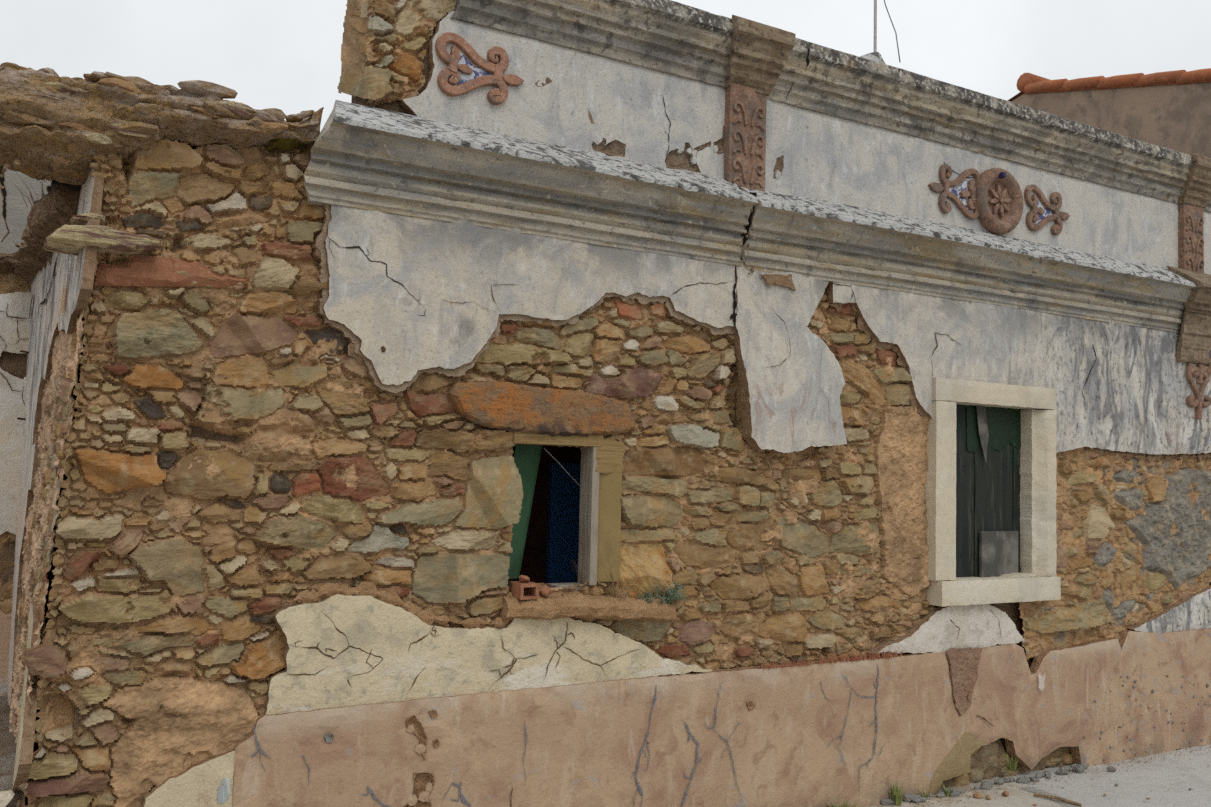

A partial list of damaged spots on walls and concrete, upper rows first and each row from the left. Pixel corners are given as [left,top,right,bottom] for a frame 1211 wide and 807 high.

spalling [665,126,724,173]
crack [0,165,9,242]
crack [673,192,757,332]
crack [0,253,70,405]
peeling [829,303,928,417]
spalling [1018,447,1211,660]
peeling [287,581,510,629]
crack [289,615,438,699]
crack [488,622,641,691]
spalling [946,647,982,716]
crack [681,681,743,807]
spalling [928,732,1073,795]